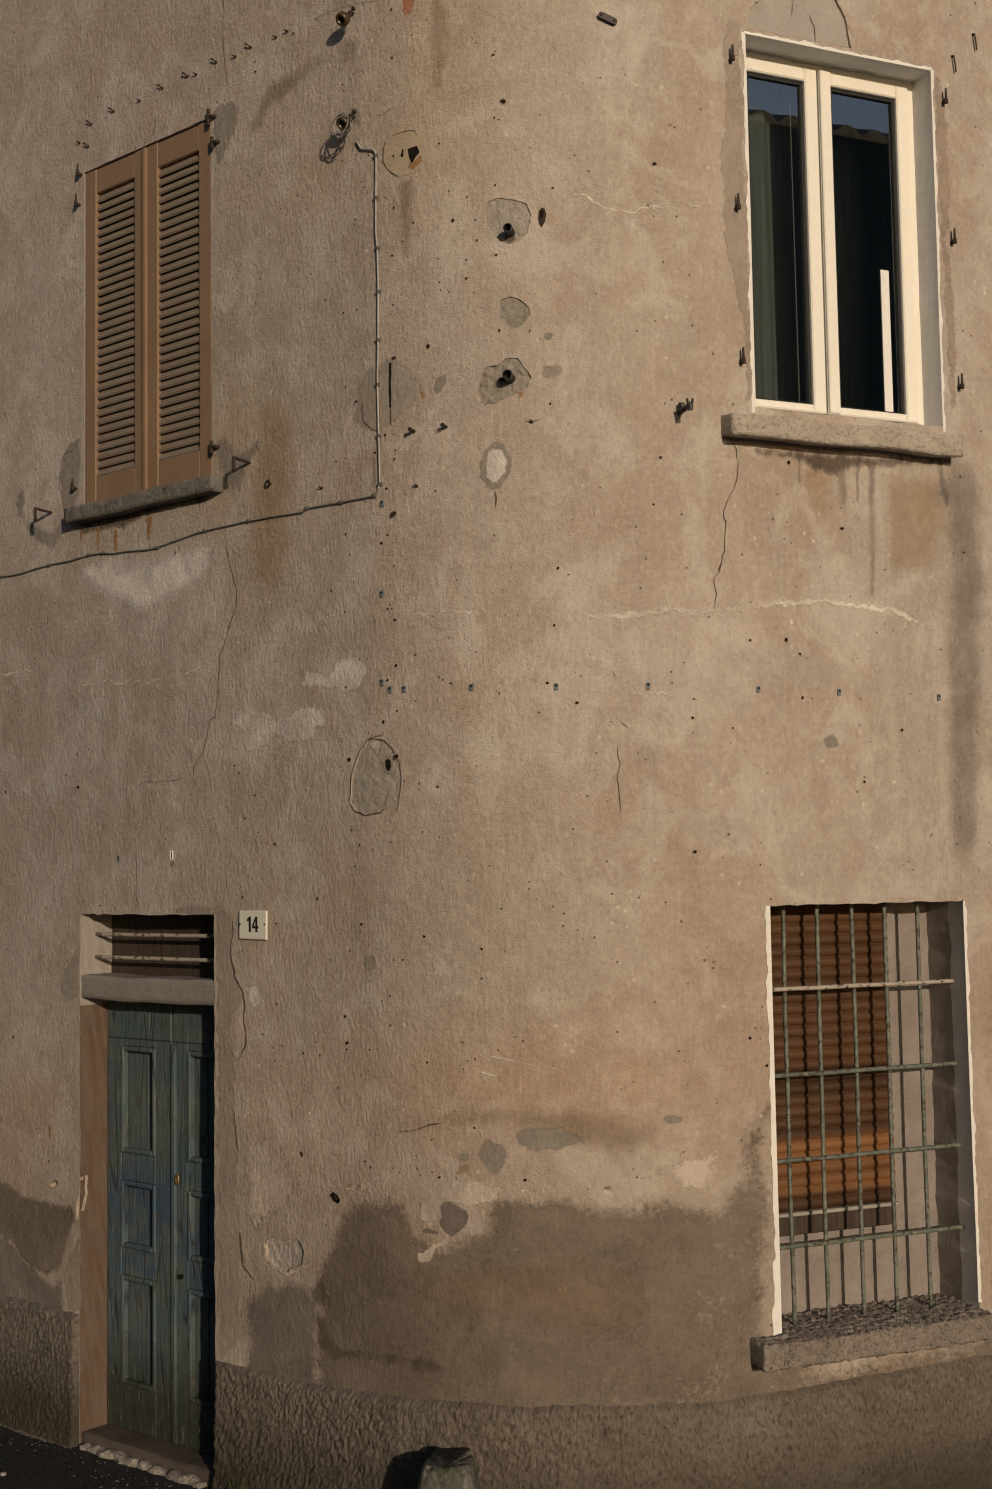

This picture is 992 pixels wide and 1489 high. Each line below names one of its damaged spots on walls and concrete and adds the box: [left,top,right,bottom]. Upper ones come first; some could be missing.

peeling [748,0,851,48]
rust [80,498,202,550]
crack [714,438,739,602]
crack [127,536,237,802]
crack [230,917,247,1057]
leakage [0,1183,74,1310]
leakage [248,1113,992,1407]